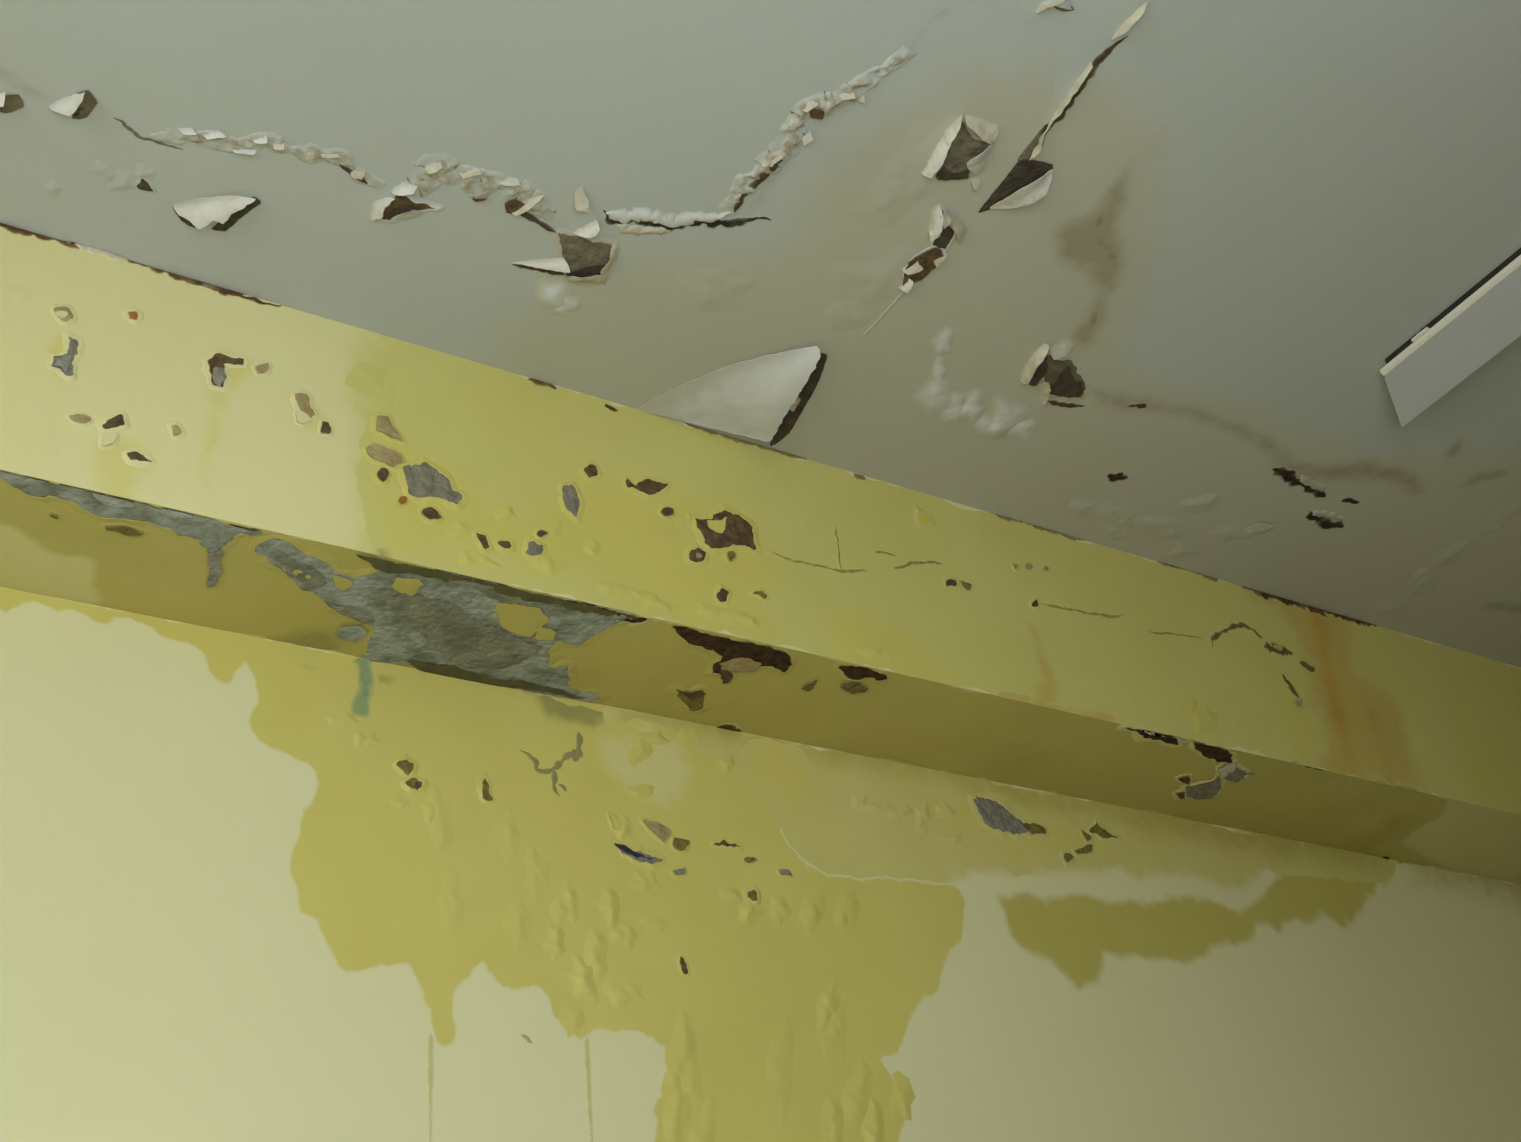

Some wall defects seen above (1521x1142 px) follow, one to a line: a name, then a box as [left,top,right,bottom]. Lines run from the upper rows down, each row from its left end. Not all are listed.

peeling [150,127,620,286]
peeling [863,0,1148,337]
peeling [637,346,827,446]
spalling [1019,338,1091,409]
water stain [63,430,165,508]
spalling [0,462,638,704]
spalling [622,474,762,567]
crack [990,512,1085,542]
crack [1042,561,1377,706]
rust [1230,583,1432,794]
crack [519,732,584,797]
water stain [0,482,1521,1142]